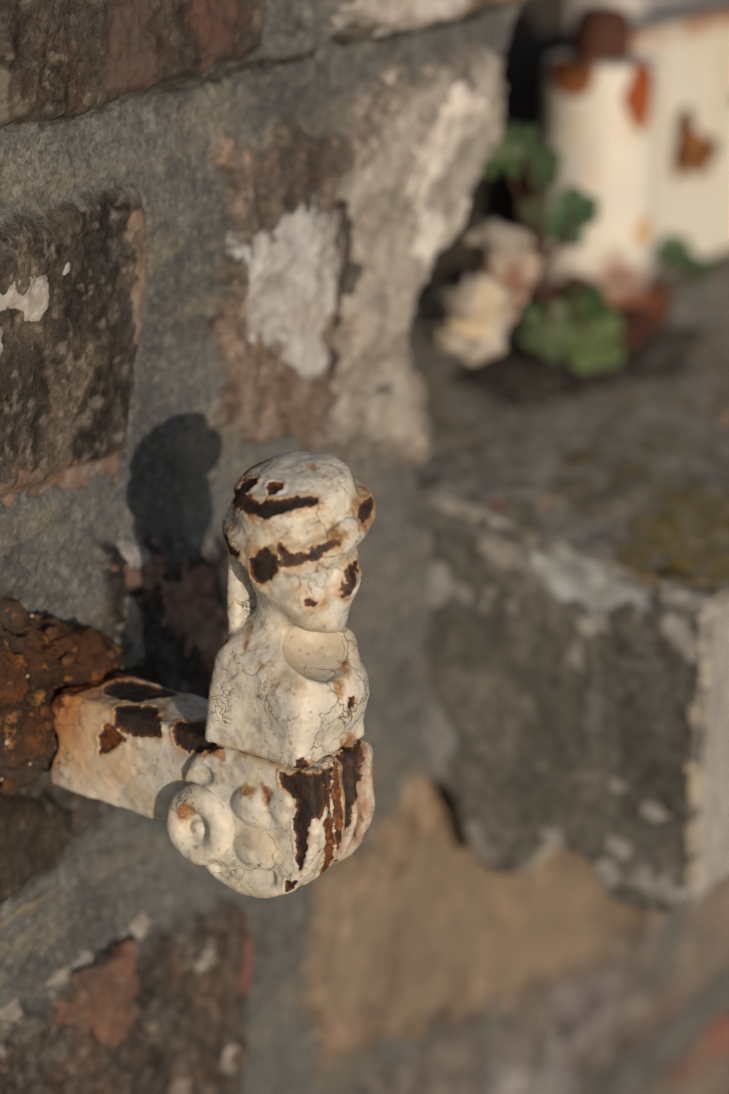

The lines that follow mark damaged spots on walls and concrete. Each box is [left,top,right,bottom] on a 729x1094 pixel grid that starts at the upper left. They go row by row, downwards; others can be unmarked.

peeling [233,478,319,520]
peeling [223,533,341,584]
peeling [340,560,359,599]
spalling [98,531,228,755]
corrosion [50,645,163,718]
spalling [423,703,459,777]
corrosion [0,767,116,899]
peeling [279,740,365,892]